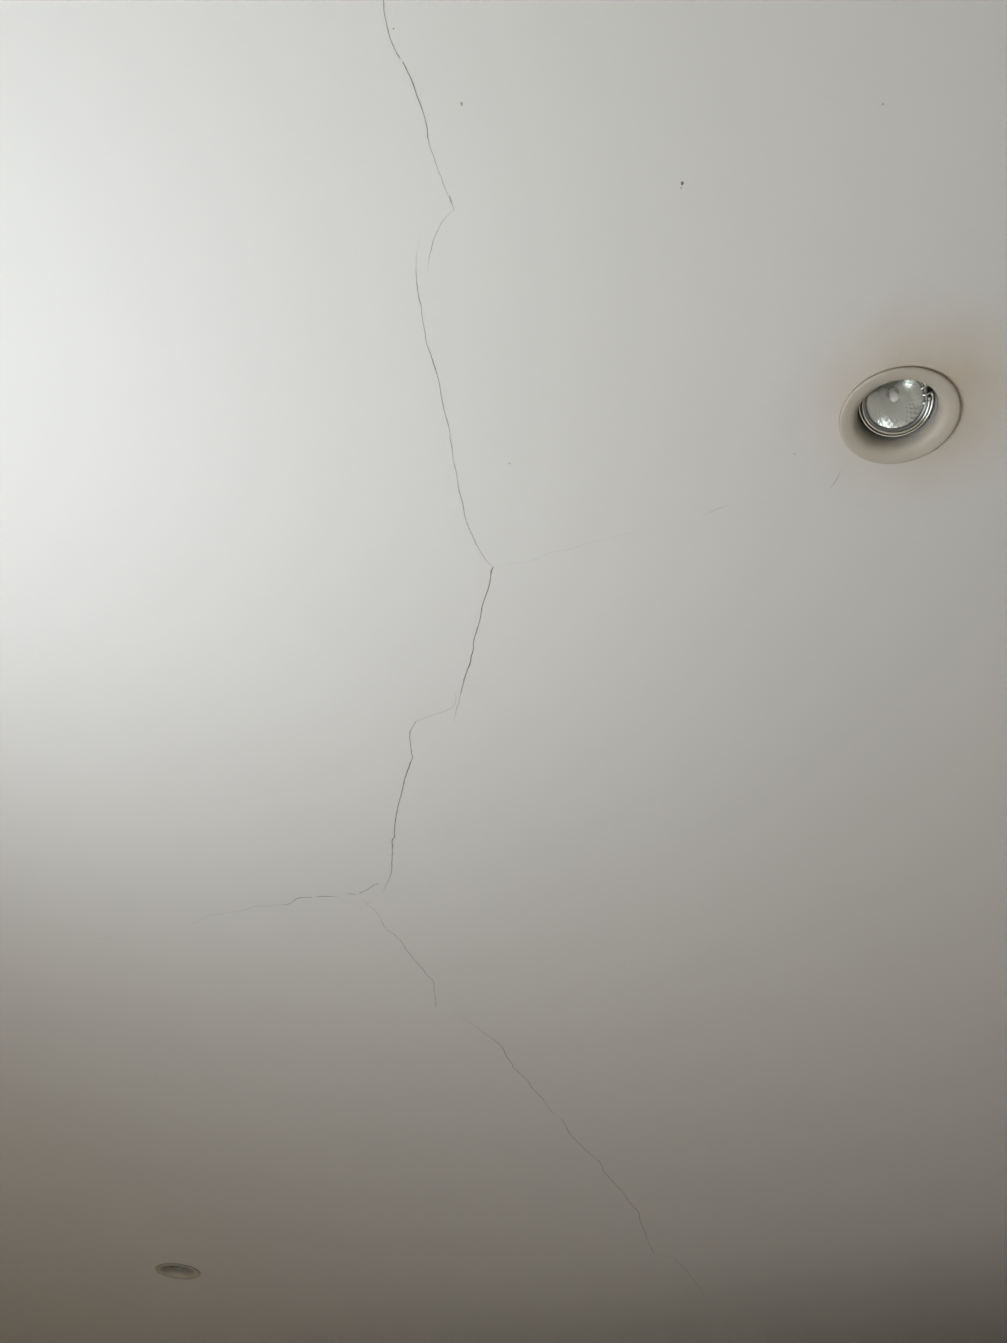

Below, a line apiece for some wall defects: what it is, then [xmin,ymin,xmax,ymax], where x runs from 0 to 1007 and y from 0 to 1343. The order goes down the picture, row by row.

crack [286,730,413,905]